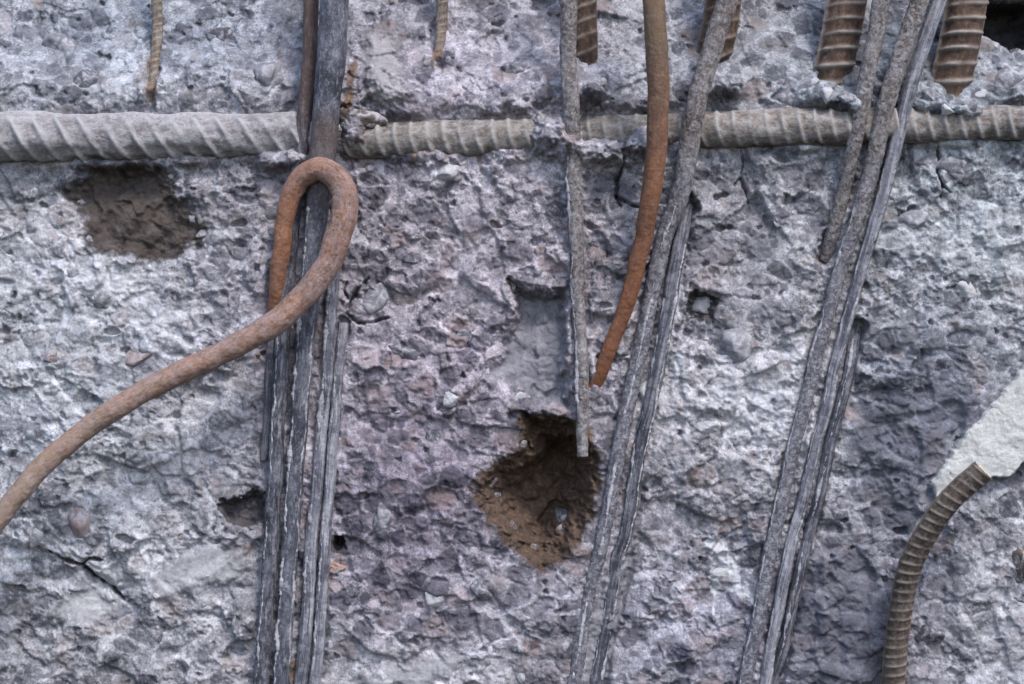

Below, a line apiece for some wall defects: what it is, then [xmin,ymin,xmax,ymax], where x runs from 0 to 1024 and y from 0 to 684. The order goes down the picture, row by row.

spalling [576,0,598,66]
spalling [813,0,867,86]
spalling [931,0,989,99]
spalling [336,118,536,159]
spalling [580,114,647,142]
spalling [699,108,852,148]
spalling [887,105,1024,143]
spalling [0,110,312,263]
spalling [485,282,568,405]
crack [50,550,124,597]
spalling [153,547,245,600]
spalling [881,461,992,684]